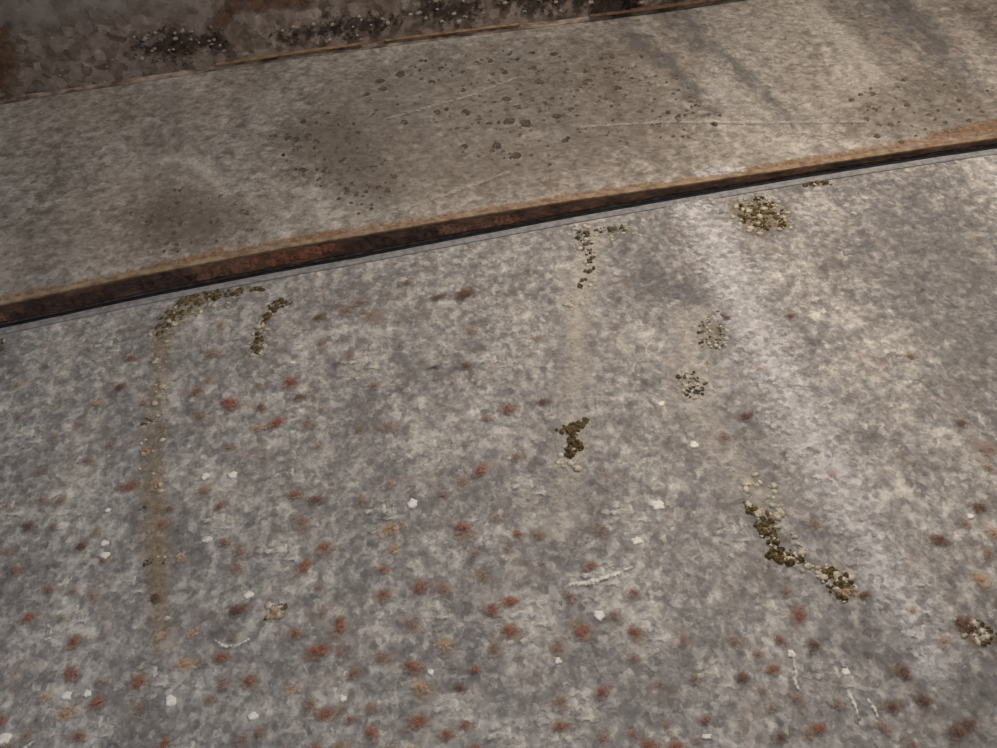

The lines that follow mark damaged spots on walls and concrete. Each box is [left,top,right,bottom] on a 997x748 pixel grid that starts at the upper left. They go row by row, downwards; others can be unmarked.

water stain [40,154,277,211]
rust [0,182,659,322]
water stain [505,231,610,546]
water stain [672,198,965,690]
rust [296,542,336,576]
rust [931,534,949,545]
rust [839,588,871,599]
rust [480,595,522,658]
rust [605,611,647,663]
water stain [691,657,738,705]
rust [305,697,394,748]
rust [439,719,472,739]